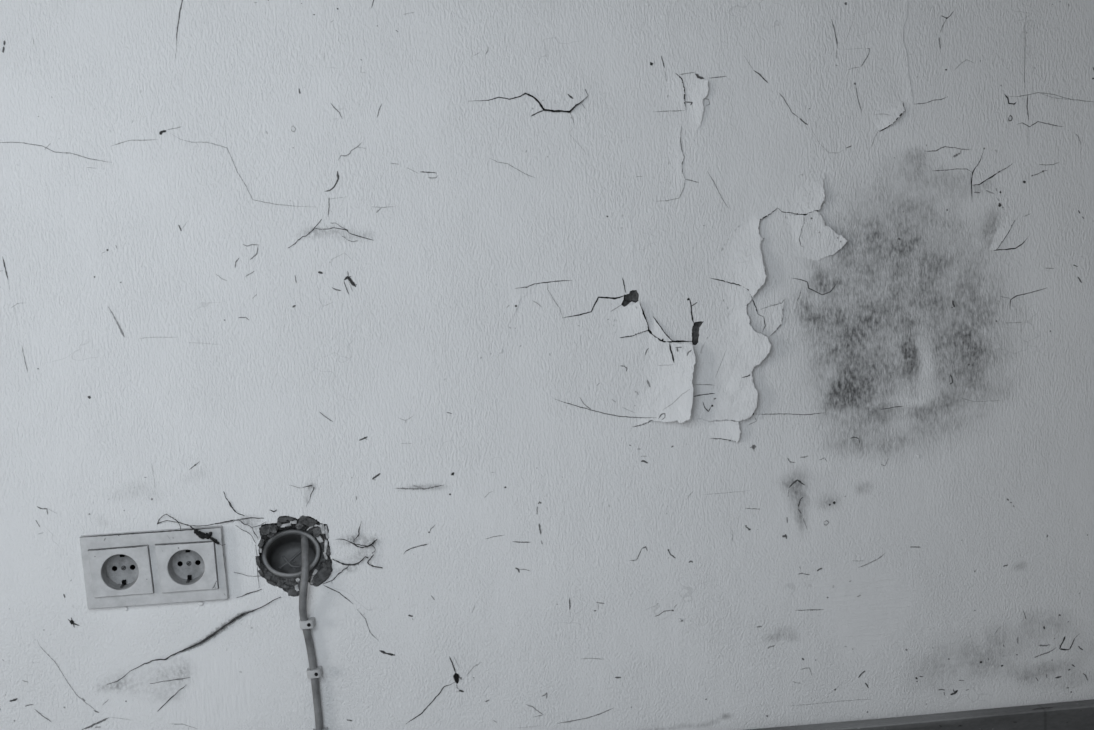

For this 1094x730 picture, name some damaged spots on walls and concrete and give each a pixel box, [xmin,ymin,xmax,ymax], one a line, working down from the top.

crack [482,86,588,116]
peeling [657,72,726,133]
crack [1005,95,1063,127]
crack [564,278,626,318]
peeling [613,169,847,443]
leakage [829,307,886,407]
leakage [902,339,916,374]
spalling [255,515,332,597]